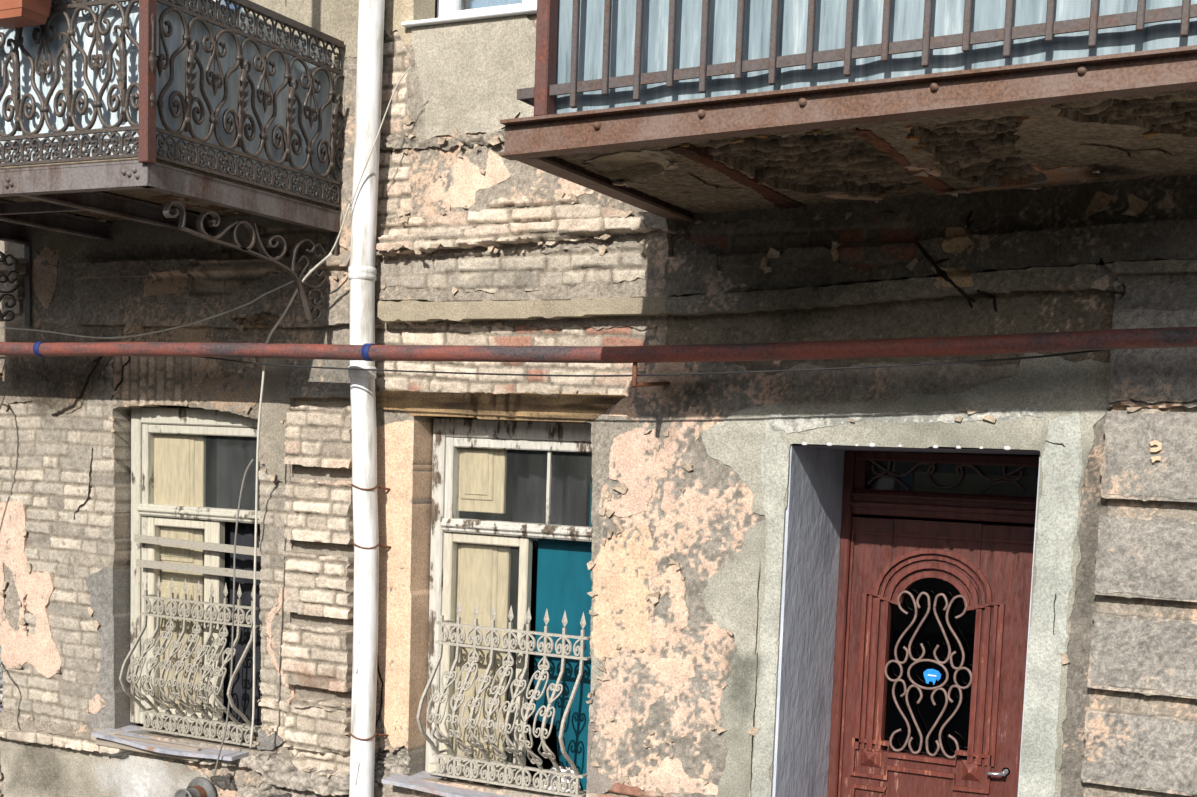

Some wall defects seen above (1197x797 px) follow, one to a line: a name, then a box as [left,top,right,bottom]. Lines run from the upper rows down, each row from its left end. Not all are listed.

spalling [1060,89,1197,139]
flaking render [375,15,654,295]
spalling [581,116,1148,217]
crack [1081,144,1172,157]
crack [914,241,997,312]
flaking render [375,318,658,346]
crack [52,356,130,416]
flaking render [0,356,263,726]
peeling [374,361,1045,797]
flaking render [253,463,351,779]
flaking render [210,773,349,797]